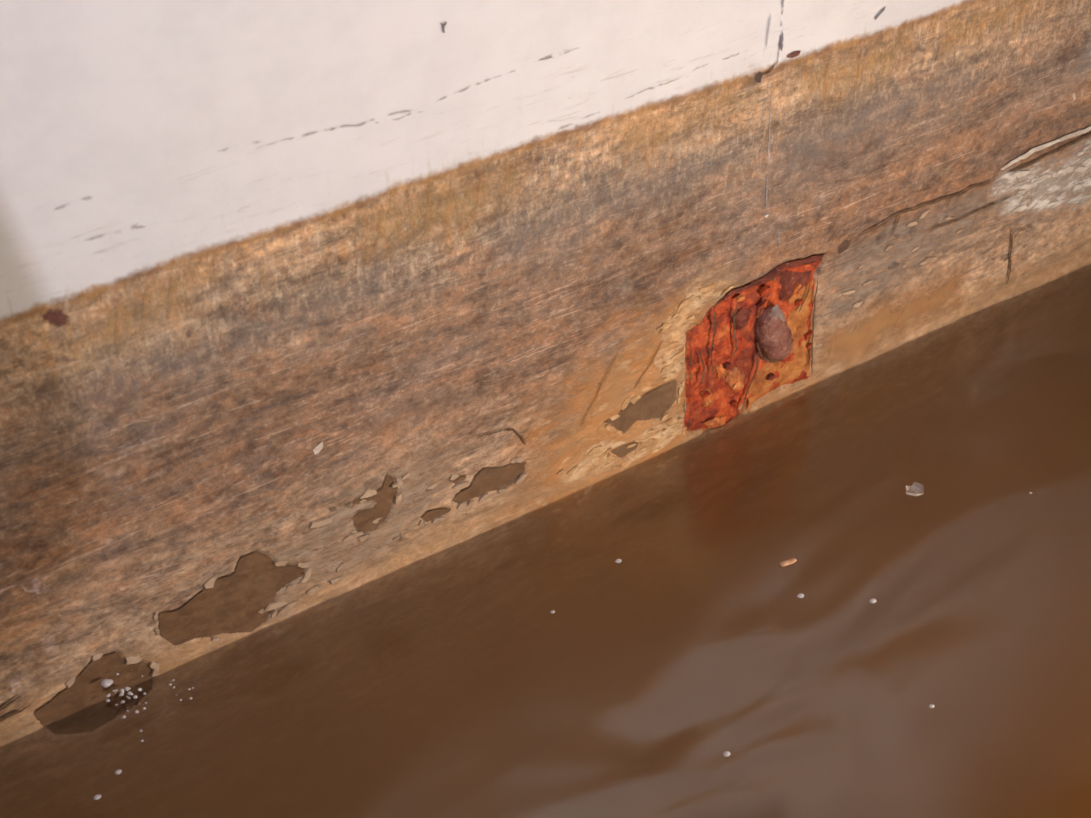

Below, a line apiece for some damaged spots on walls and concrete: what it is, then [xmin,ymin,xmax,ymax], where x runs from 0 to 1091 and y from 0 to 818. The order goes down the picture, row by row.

crack [762,0,784,247]
crack [858,133,1091,237]
spalling [838,240,851,254]
spalling [876,209,930,270]
crack [1003,228,1026,285]
spalling [604,254,824,461]
corrosion [521,308,820,560]
peeling [309,456,528,542]
peeling [153,552,344,646]
peeling [34,652,160,734]